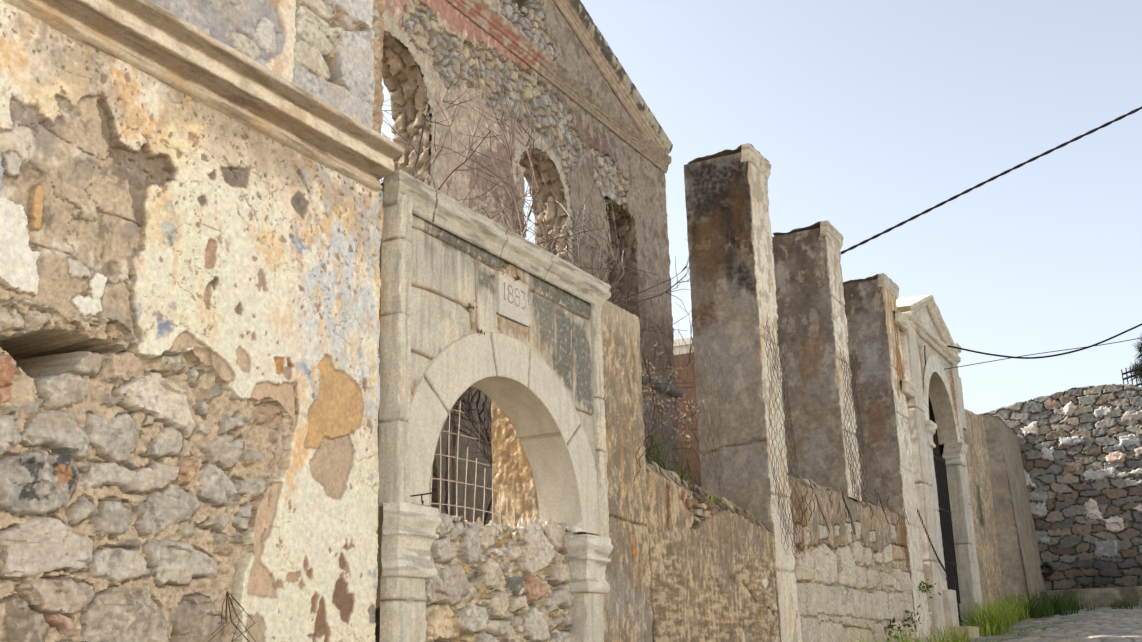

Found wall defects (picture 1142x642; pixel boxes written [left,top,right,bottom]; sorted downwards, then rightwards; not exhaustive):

spalling [322,54,343,82]
spalling [0,93,363,642]
spalling [685,491,718,530]
peeling [368,605,376,625]